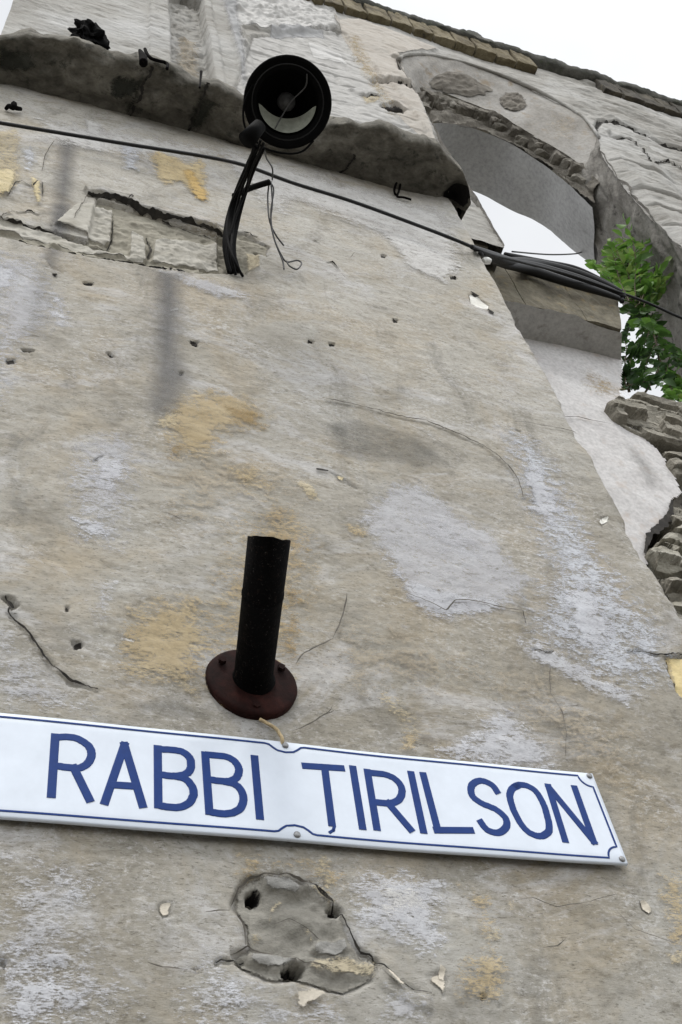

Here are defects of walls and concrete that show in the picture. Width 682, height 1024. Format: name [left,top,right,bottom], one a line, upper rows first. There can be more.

peeling [34,117,468,283]
spalling [0,203,268,406]
crack [328,398,523,495]
crack [5,595,98,689]
rust [206,497,321,679]
spalling [175,868,452,1024]